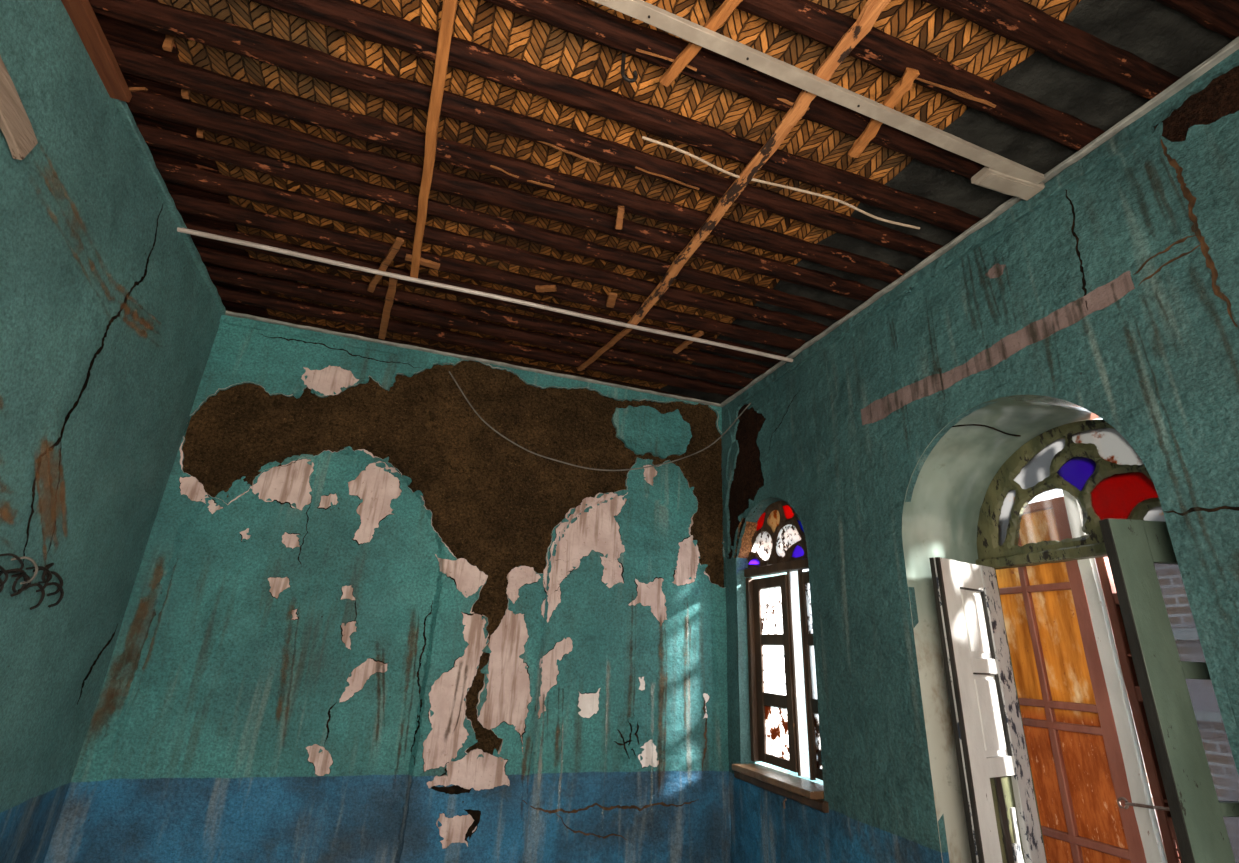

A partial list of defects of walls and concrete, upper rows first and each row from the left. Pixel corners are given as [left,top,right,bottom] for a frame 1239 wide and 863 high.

flaking render [1151,66,1239,142]
crack [1065,189,1088,310]
crack [1138,139,1238,327]
crack [23,204,163,562]
rust [36,440,67,560]
flaking render [179,360,766,795]
crack [77,624,118,705]
peeling [436,809,481,849]